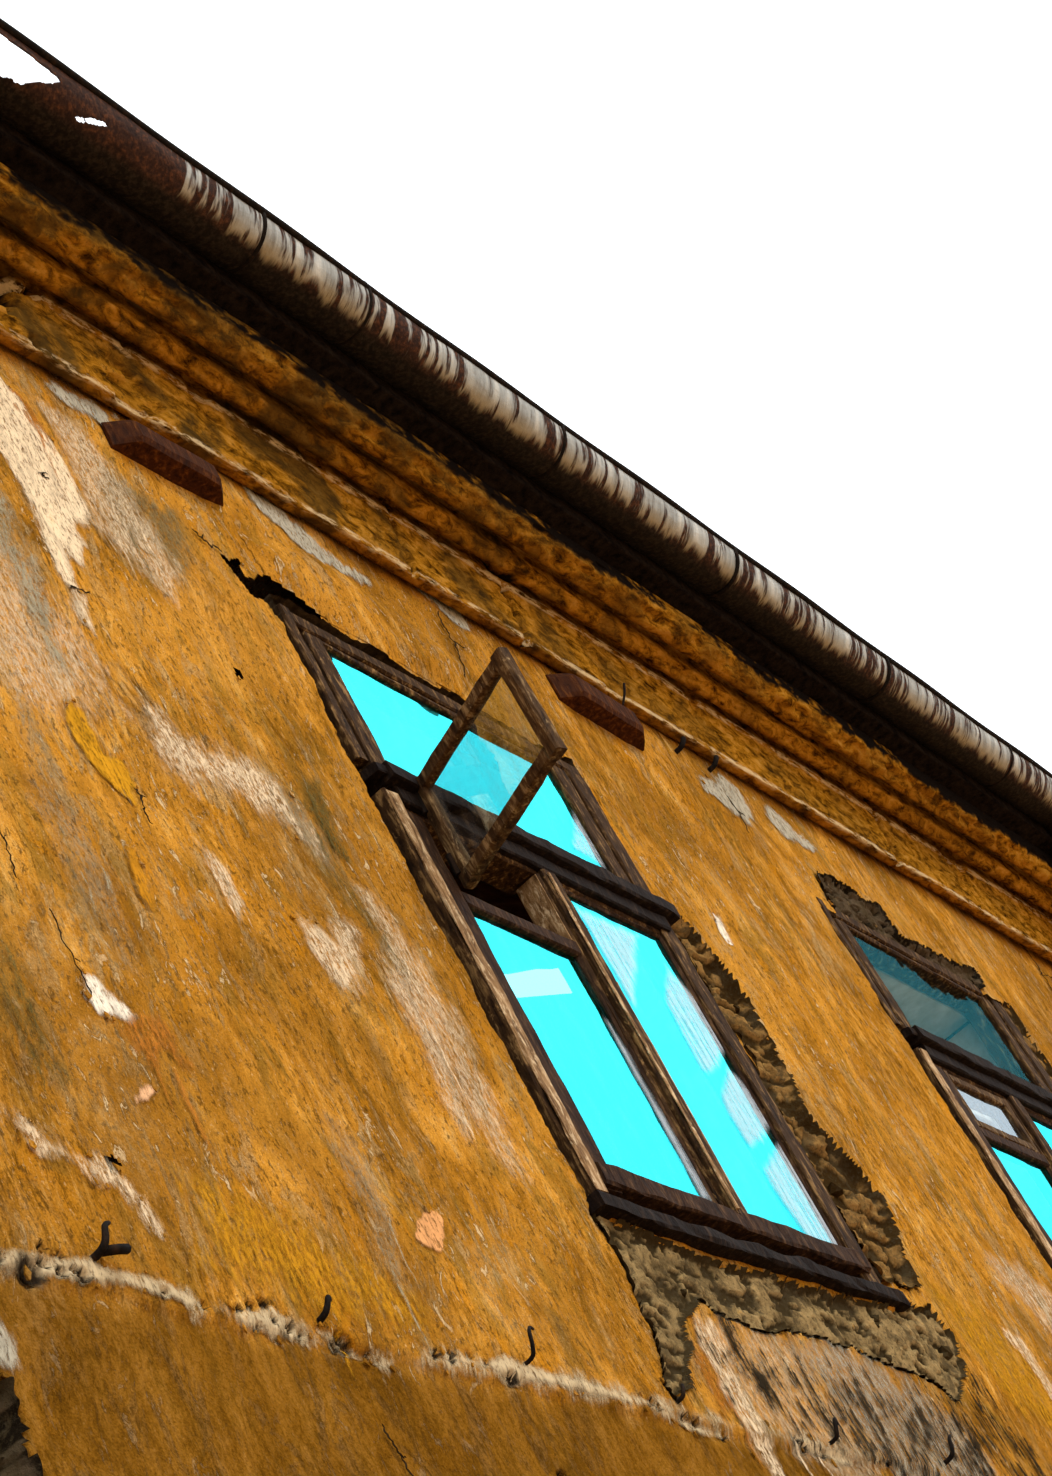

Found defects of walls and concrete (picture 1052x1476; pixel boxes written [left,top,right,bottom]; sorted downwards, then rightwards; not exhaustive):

flaking render [46,381,109,424]
flaking render [0,377,93,628]
crack [192,529,222,552]
flaking render [415,1204,445,1251]
spalling [421,913,995,1476]
spalling [0,1238,209,1322]
spalling [227,1299,396,1373]
spalling [0,1325,43,1476]